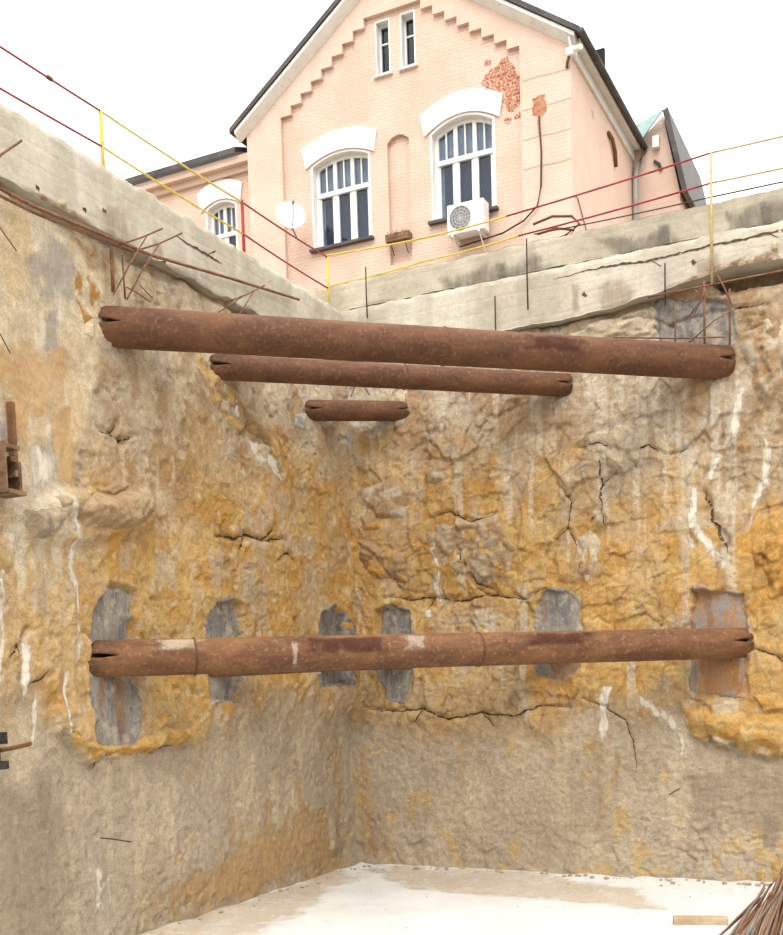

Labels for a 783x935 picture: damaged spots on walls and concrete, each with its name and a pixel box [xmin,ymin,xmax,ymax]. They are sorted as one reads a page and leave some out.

peeling [481,57,521,124]
water stain [67,495,82,659]
water stain [20,643,37,747]
water stain [62,671,73,735]